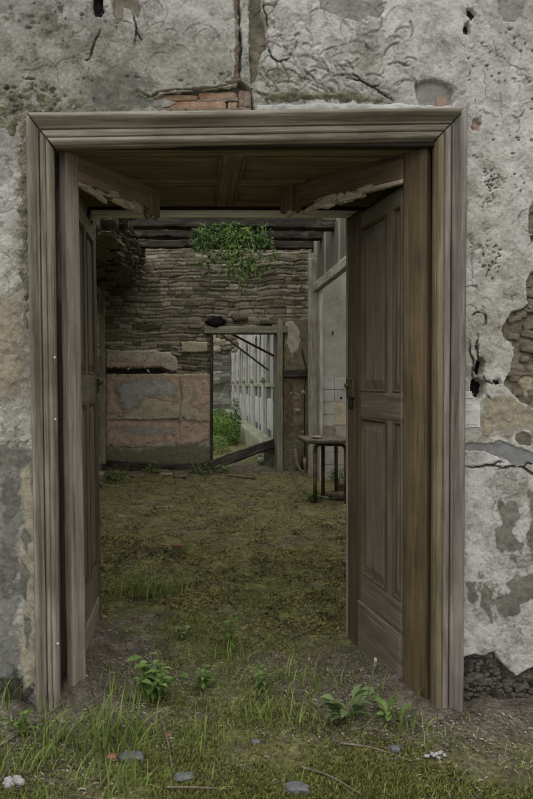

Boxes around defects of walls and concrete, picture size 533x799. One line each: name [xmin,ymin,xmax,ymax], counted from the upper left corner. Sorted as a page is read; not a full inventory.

flaking render [136,74,254,111]
crack [346,74,394,101]
flaking render [470,360,485,397]
crack [467,461,533,475]